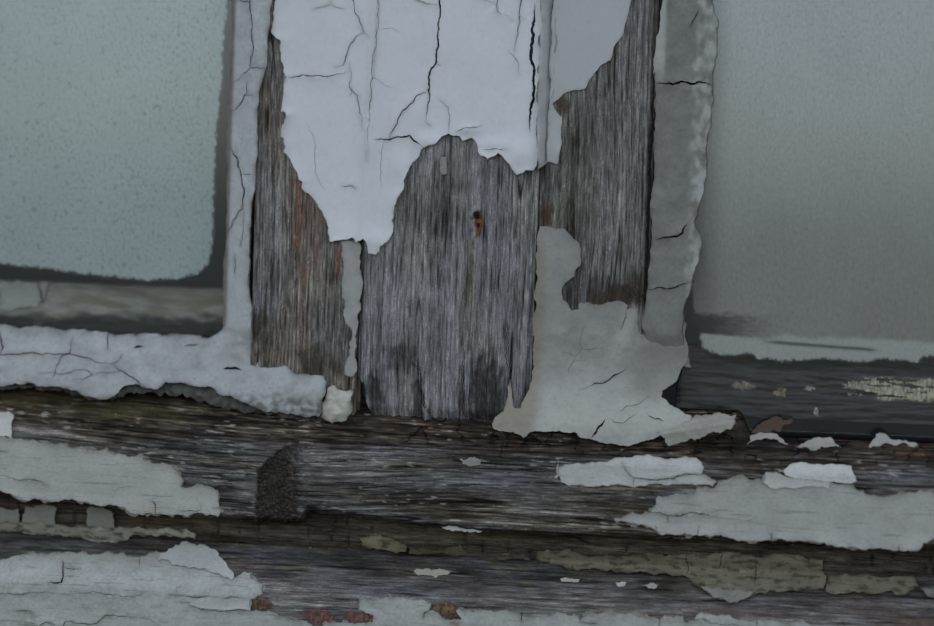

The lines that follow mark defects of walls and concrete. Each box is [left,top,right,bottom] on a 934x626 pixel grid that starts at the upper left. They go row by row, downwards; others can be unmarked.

crack [286,0,479,145]
crack [492,0,536,132]
peeling [271,0,631,377]
rust [471,211,484,237]
crack [622,73,709,327]
crack [0,332,138,381]
crack [591,398,663,438]
peeling [492,226,934,552]
rust [303,607,374,626]
peeling [0,412,839,626]
rust [430,601,459,626]
peeling [360,534,934,603]